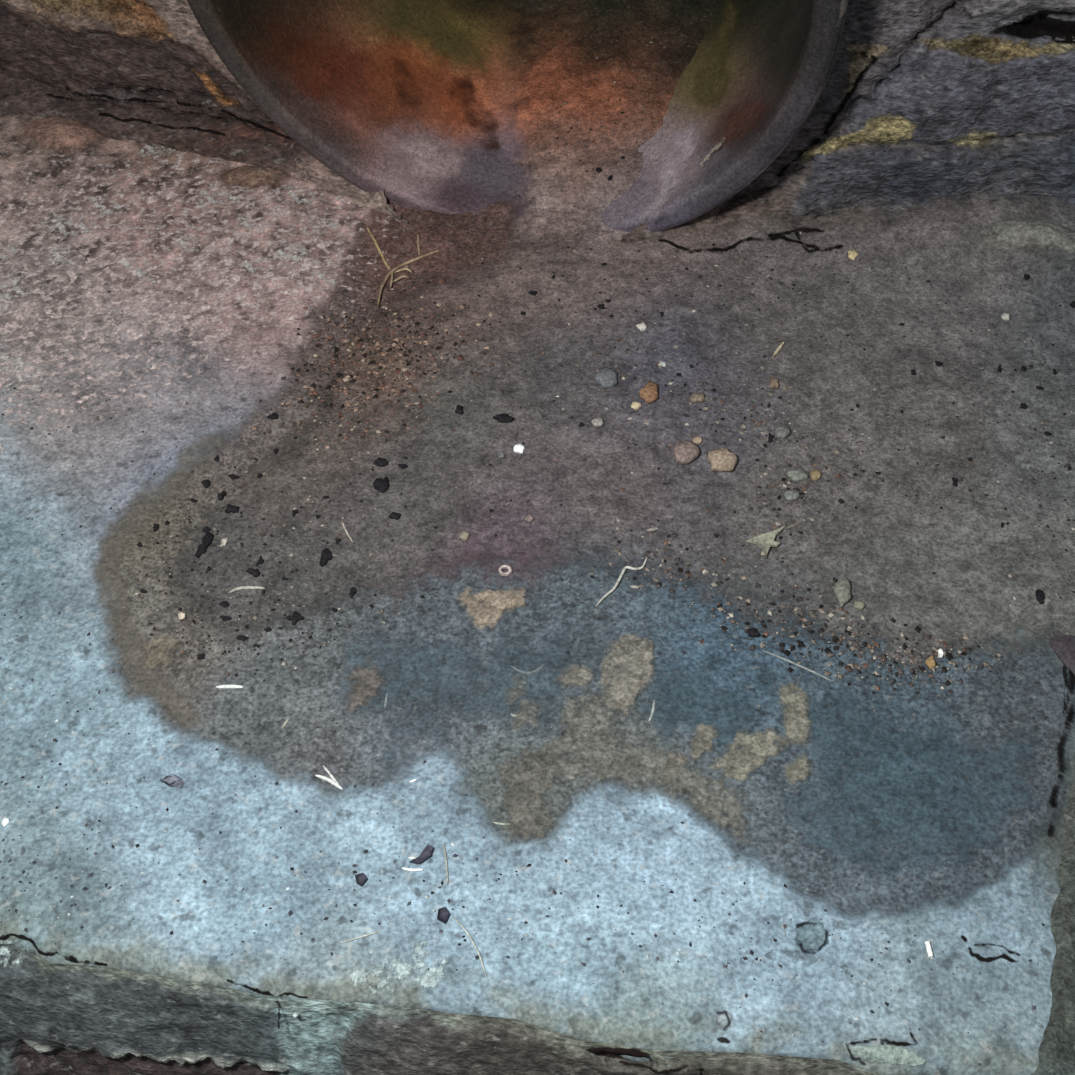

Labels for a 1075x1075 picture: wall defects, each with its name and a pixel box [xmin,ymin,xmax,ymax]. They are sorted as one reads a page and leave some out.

rust [195,72,237,105]
crack [658,227,842,253]
leakage [0,128,1075,916]
crack [1048,665,1075,837]
efflorescence [347,941,446,996]